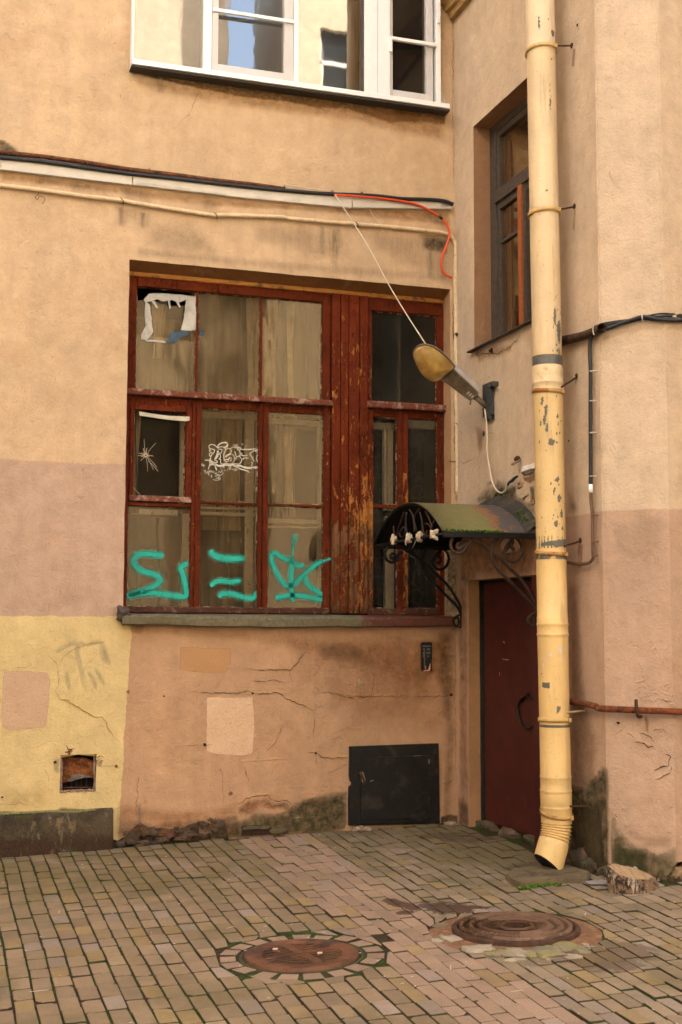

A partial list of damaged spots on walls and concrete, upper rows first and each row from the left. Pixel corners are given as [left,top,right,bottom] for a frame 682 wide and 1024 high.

crack [594,0,675,780]
crack [4,640,118,740]
crack [163,636,457,809]
leakage [568,770,608,869]